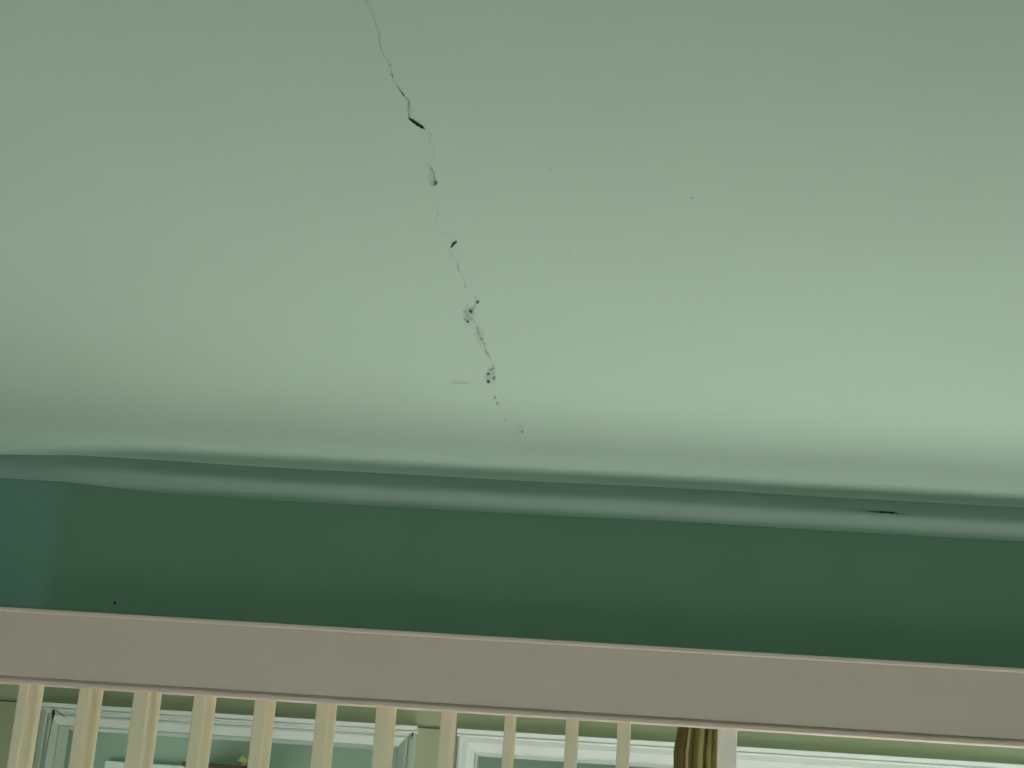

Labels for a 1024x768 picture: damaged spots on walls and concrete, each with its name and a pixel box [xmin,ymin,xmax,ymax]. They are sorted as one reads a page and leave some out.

crack [401,92,425,129]